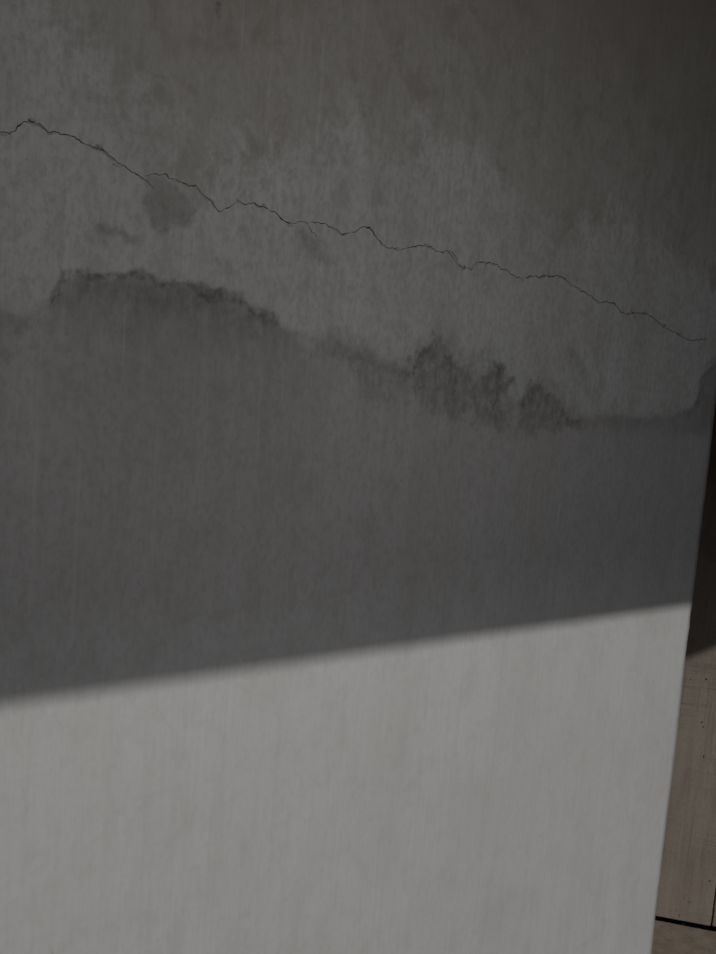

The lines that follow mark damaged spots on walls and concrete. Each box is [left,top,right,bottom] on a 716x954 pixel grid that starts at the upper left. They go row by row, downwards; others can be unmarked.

crack [0,118,708,341]